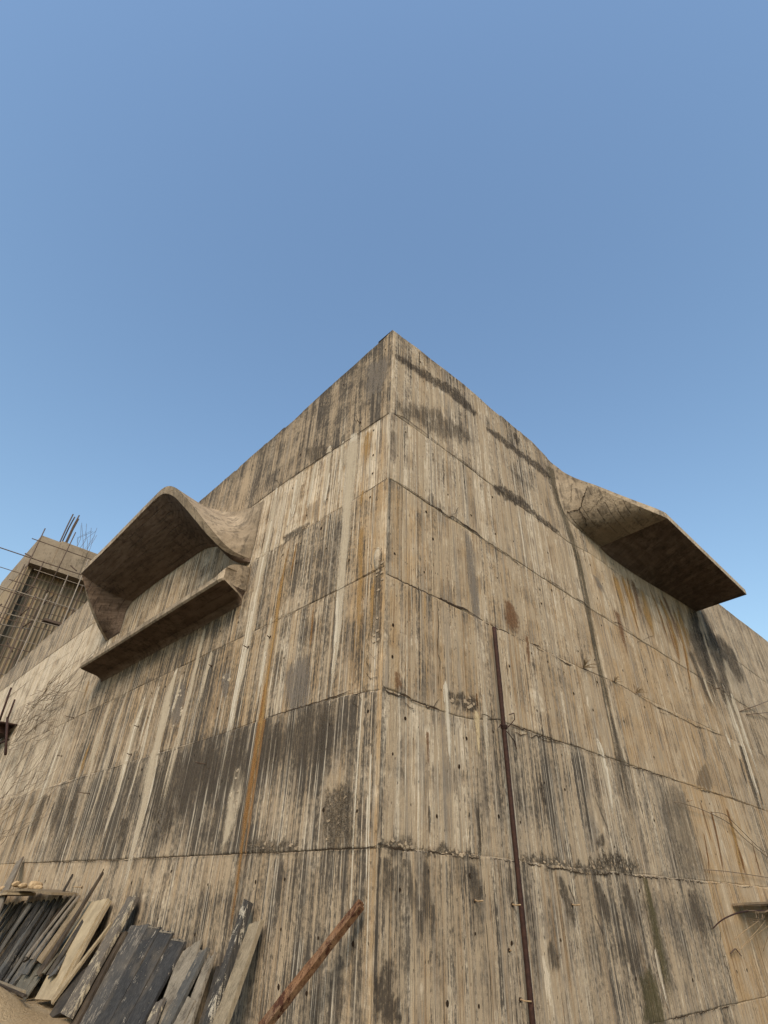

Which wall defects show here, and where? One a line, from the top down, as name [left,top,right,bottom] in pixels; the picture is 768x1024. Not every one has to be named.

water stain [366,351,476,442]
water stain [24,677,132,843]
water stain [102,433,359,884]
rust [231,544,297,918]
rust [505,601,530,661]
water stain [684,608,763,808]